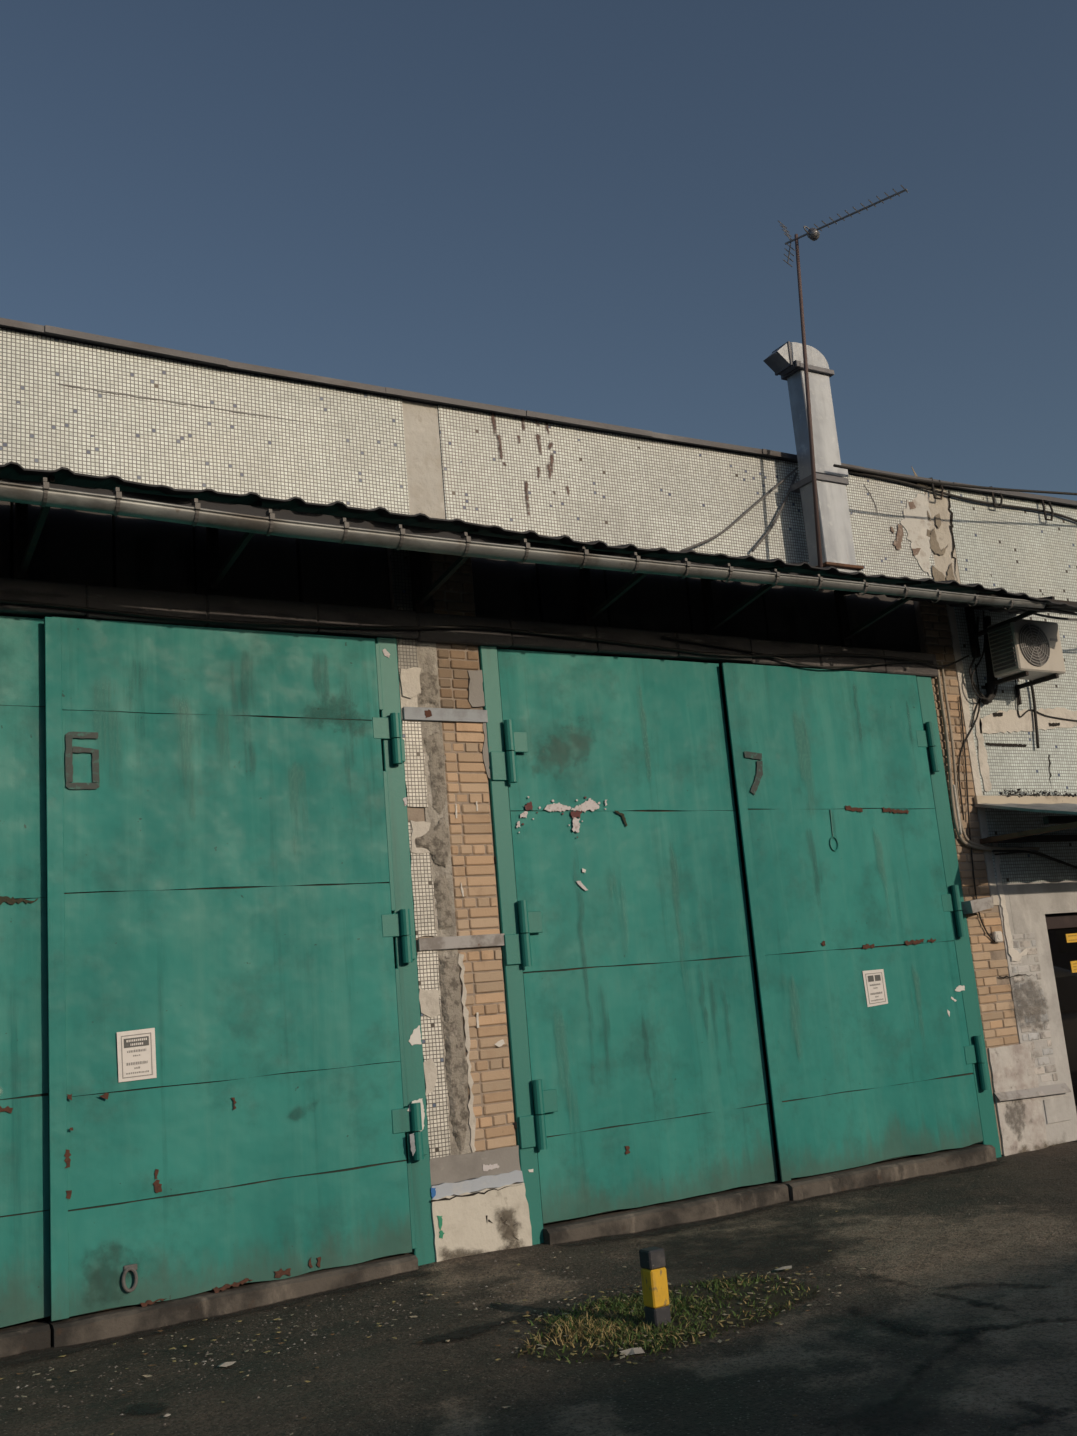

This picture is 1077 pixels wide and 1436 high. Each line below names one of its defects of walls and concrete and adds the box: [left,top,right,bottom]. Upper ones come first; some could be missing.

corrosion [491,412,570,515]
flaking render [890,466,955,581]
spalling [418,672,441,705]
spalling [415,732,452,930]
peeling [516,796,627,838]
corrosion [0,896,38,905]
peeling [408,1025,422,1046]
spalling [439,955,469,1155]